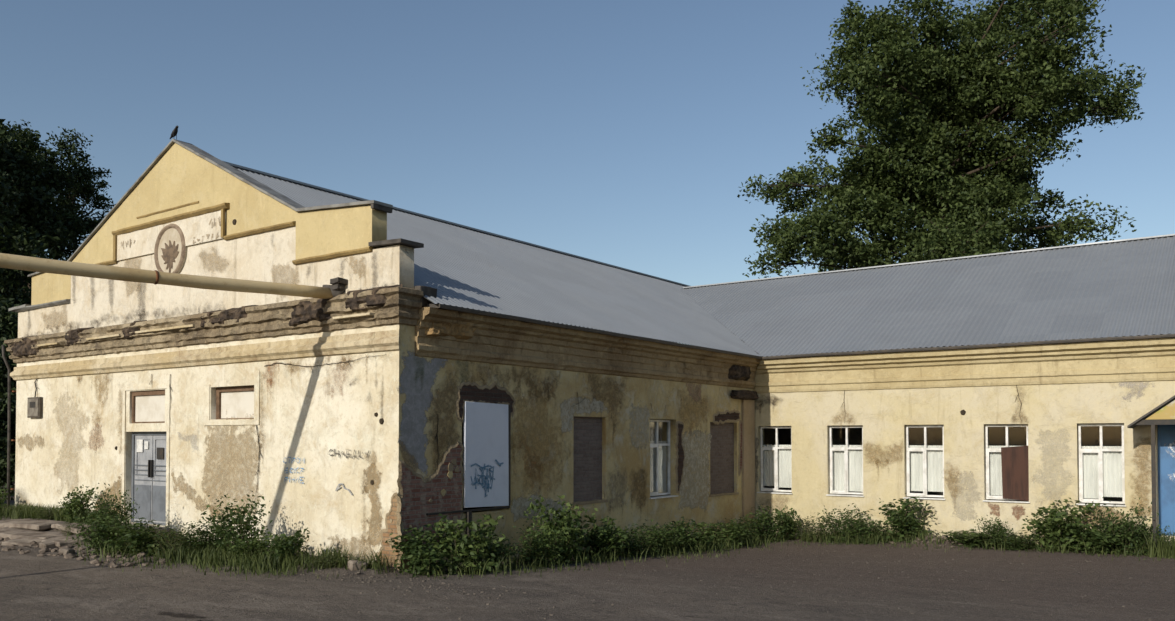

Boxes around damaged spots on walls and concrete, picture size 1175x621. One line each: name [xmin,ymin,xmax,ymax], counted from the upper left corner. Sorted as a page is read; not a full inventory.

flaking render [455,381,516,423]
peeling [171,416,260,516]
flaking render [328,351,464,570]
peeling [949,472,1025,521]